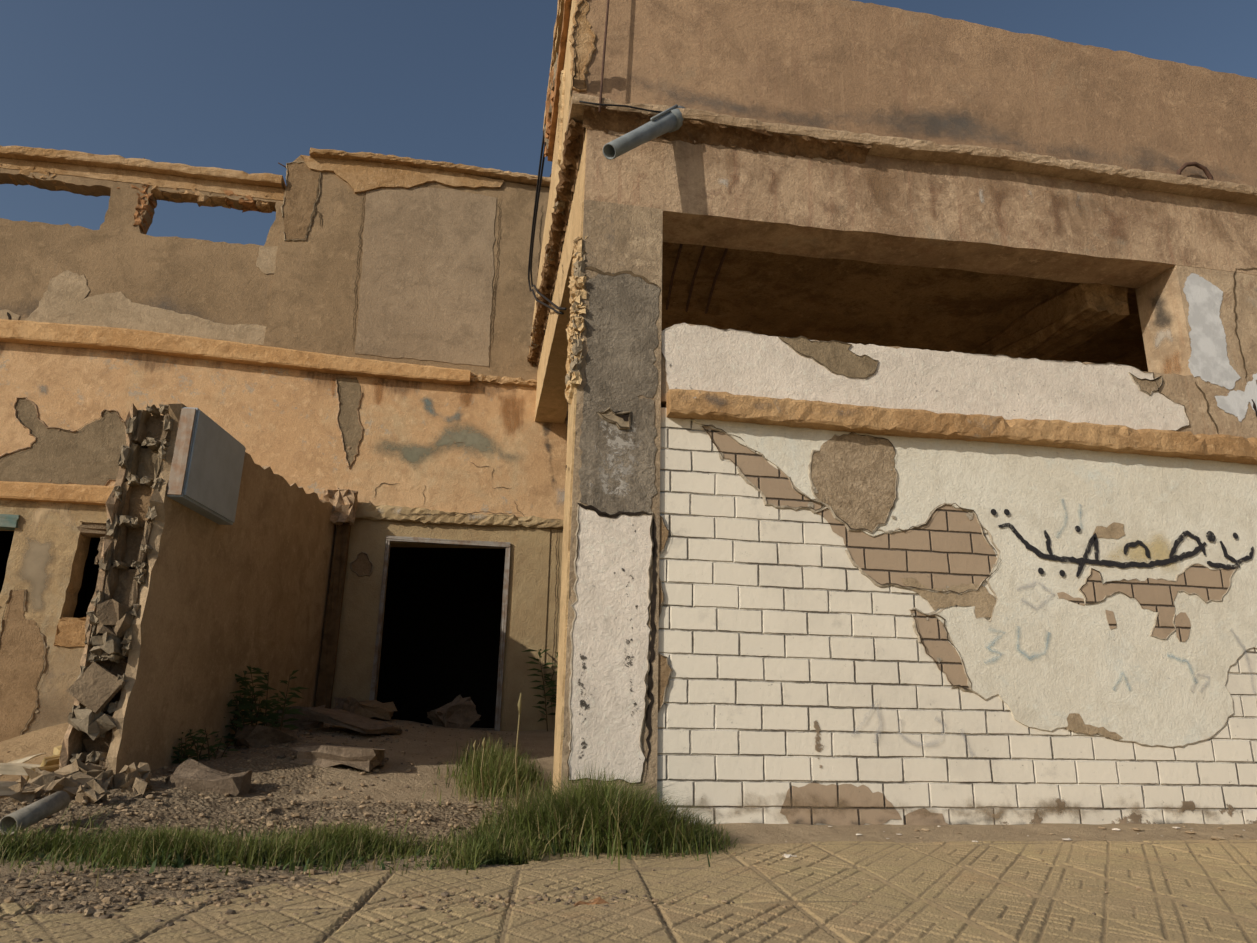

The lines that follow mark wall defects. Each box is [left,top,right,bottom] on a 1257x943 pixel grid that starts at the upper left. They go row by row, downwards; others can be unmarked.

flaking render [0,397,126,486]
flaking render [336,376,364,469]
peeling [778,336,878,379]
flaking render [807,432,898,534]
crack [963,352,1218,433]
flaking render [1128,372,1163,396]
crack [1233,267,1257,416]
flaking render [1093,522,1125,539]
flaking render [0,589,48,742]
crack [551,503,657,784]
flaking render [1057,563,1237,642]
peeling [780,782,949,826]